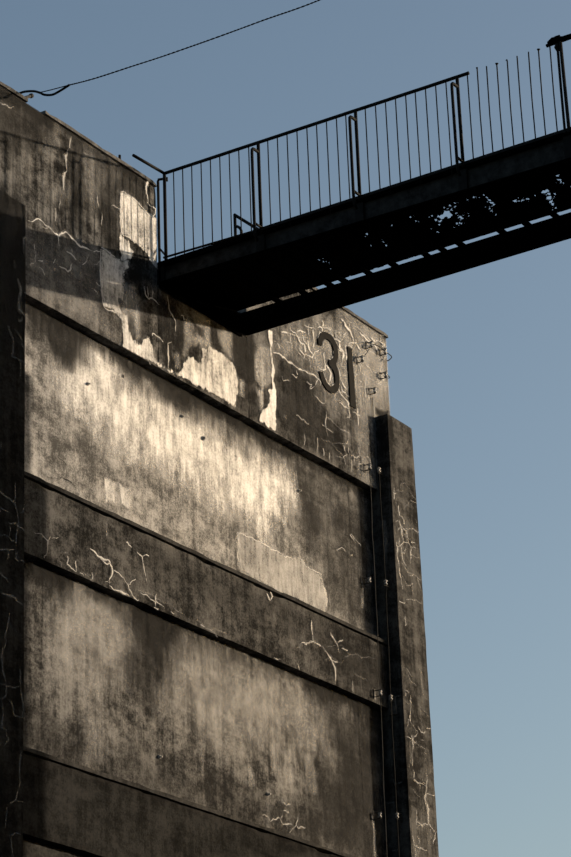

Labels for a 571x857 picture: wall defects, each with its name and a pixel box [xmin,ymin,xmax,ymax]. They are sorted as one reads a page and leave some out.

crack [28,140,100,294]
peeling [99,191,238,406]
peeling [260,330,276,431]
crack [273,320,385,425]
crack [67,542,174,614]
peeling [237,532,327,612]
crack [302,620,336,681]
damp [24,560,388,857]